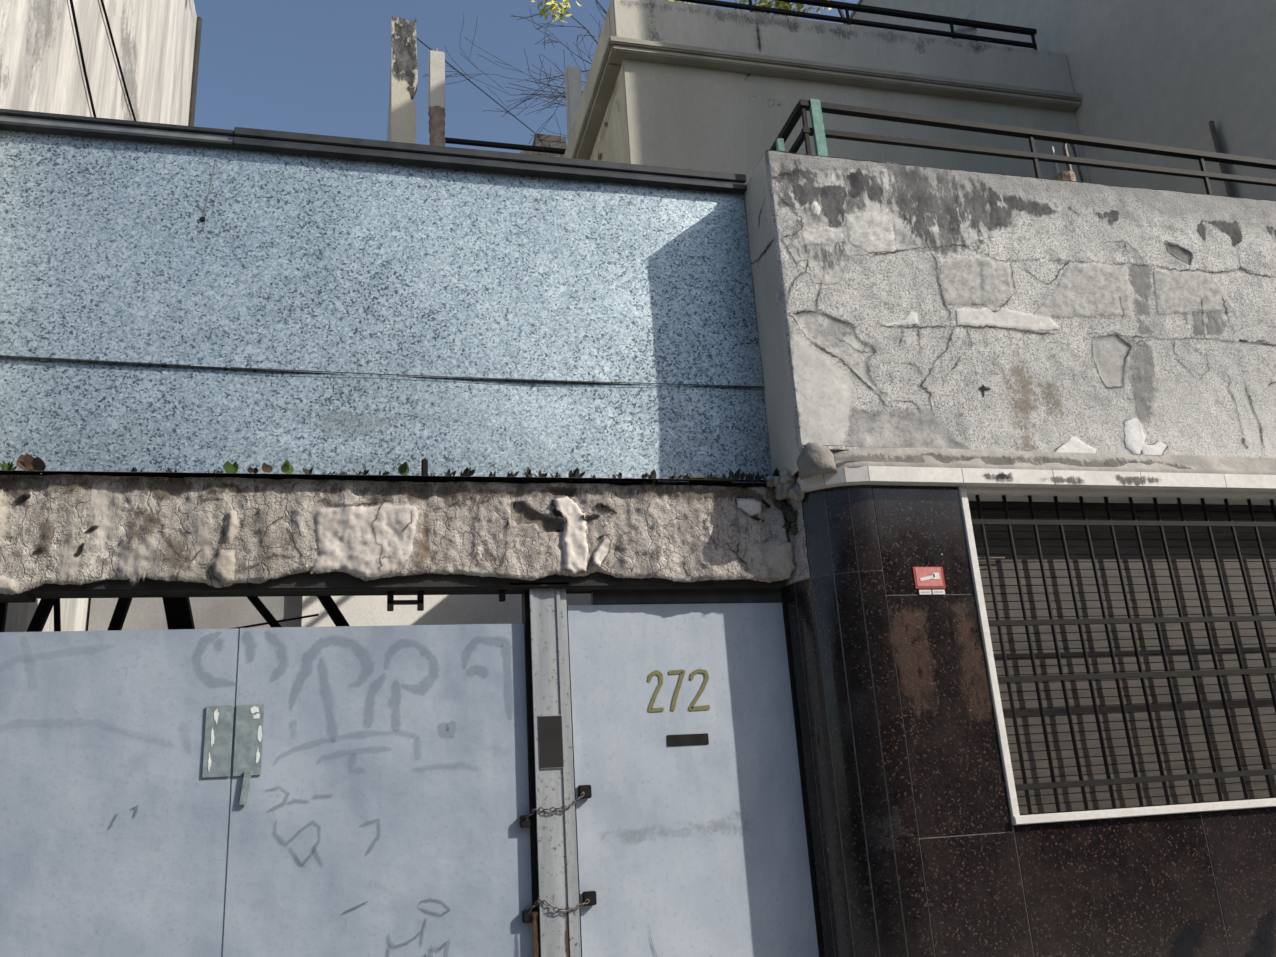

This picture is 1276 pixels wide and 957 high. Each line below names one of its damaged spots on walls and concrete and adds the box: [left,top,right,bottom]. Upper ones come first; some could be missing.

leakage [390,16,418,91]
crack [750,173,1089,416]
peeling [777,166,1132,331]
peeling [1154,241,1237,314]
leakage [1124,263,1157,423]
crack [1091,241,1276,449]
peeling [1124,418,1169,455]
spalling [74,525,99,557]
crack [158,494,202,561]
crack [197,484,509,569]
peeling [311,502,419,577]
peeling [511,487,617,574]